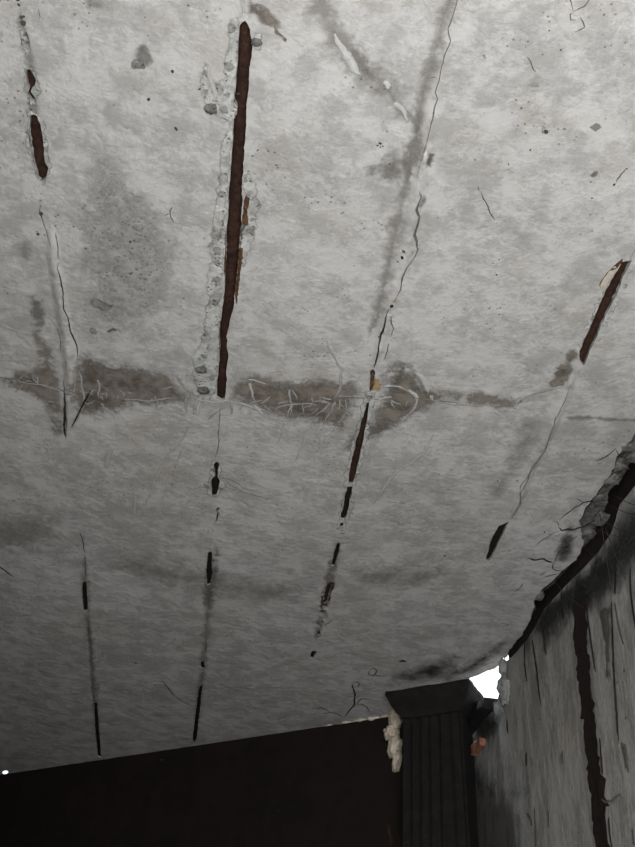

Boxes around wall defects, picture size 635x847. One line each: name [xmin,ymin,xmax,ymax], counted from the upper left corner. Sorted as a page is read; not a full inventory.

damp [331,25,391,89]
crack [570,0,589,32]
spalling [191,17,262,400]
damp [370,141,434,197]
crack [374,0,458,368]
crack [39,209,78,357]
crack [0,377,139,437]
damp [10,301,361,460]
damp [369,350,577,434]
crack [511,385,571,519]
crack [515,497,605,591]
spalling [516,434,635,641]